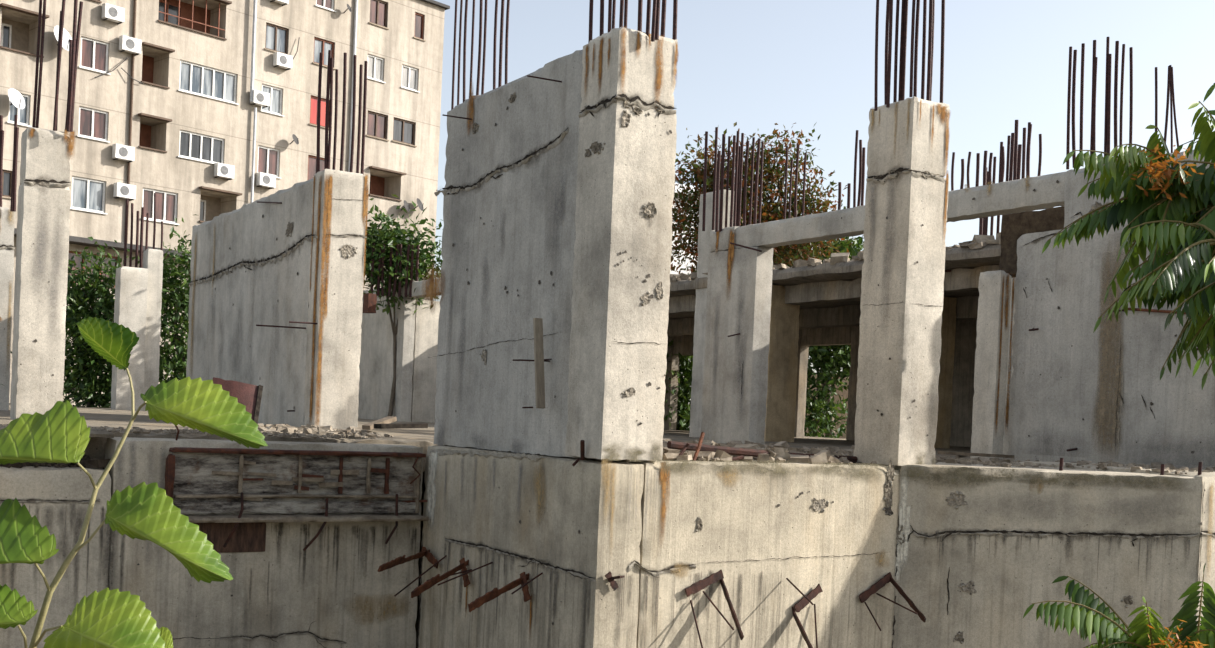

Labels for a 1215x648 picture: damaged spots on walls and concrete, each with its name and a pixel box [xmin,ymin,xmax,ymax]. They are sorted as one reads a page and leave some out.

corrosion [585,29,678,97]
crack [434,94,677,196]
crack [866,168,944,185]
corrosion [895,99,950,238]
corrosion [309,176,333,423]
corrosion [660,462,670,528]
crack [417,536,596,648]
crack [628,482,1215,648]